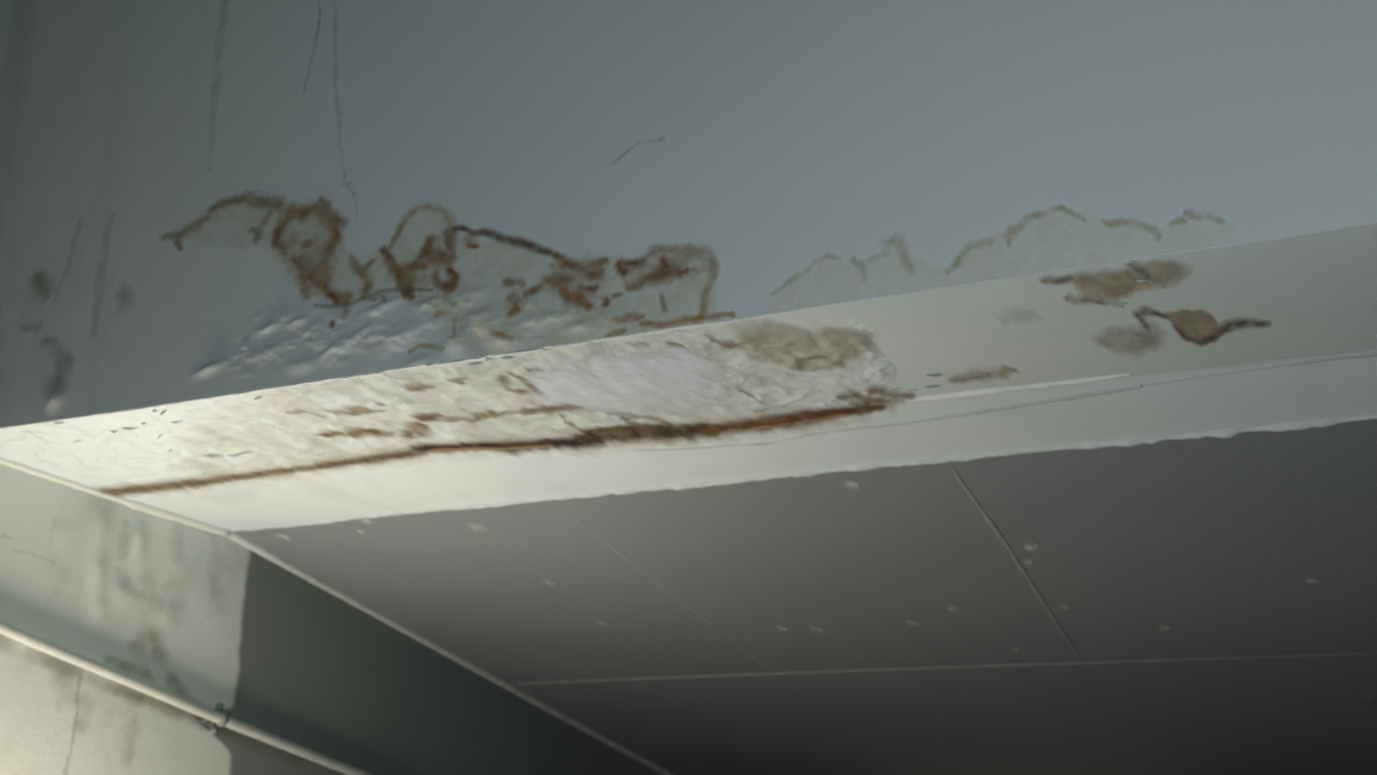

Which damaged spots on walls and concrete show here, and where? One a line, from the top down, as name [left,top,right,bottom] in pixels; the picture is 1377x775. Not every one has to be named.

peeling [1041,263,1265,348]
peeling [0,321,1016,488]